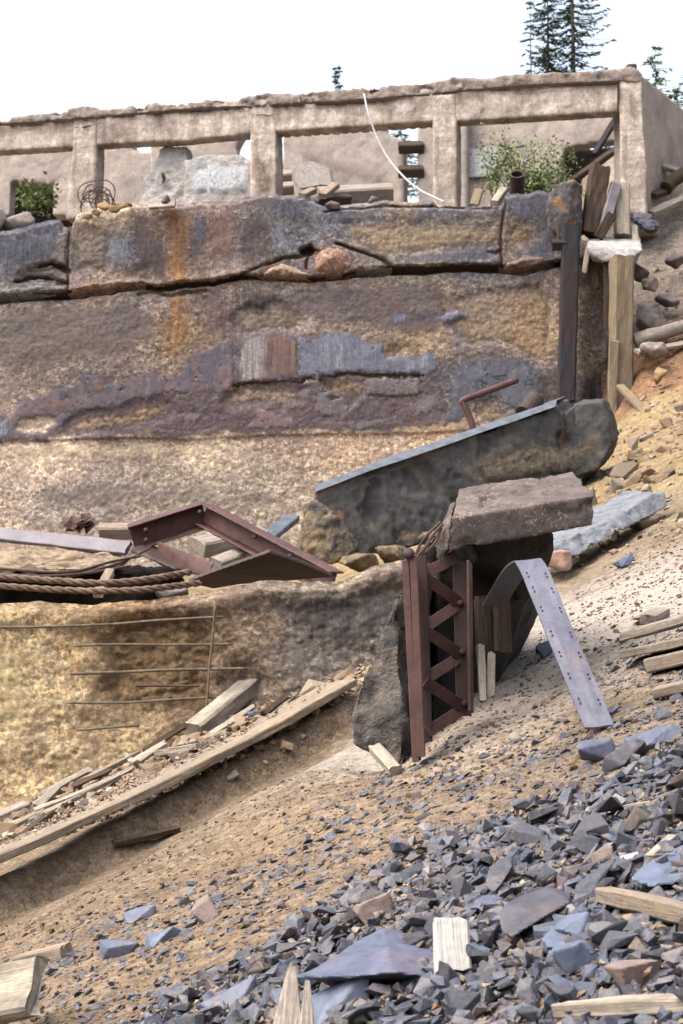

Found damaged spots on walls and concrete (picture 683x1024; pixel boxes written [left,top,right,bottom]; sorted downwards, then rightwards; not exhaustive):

crack [0,199,561,304]
flaking render [0,290,547,444]